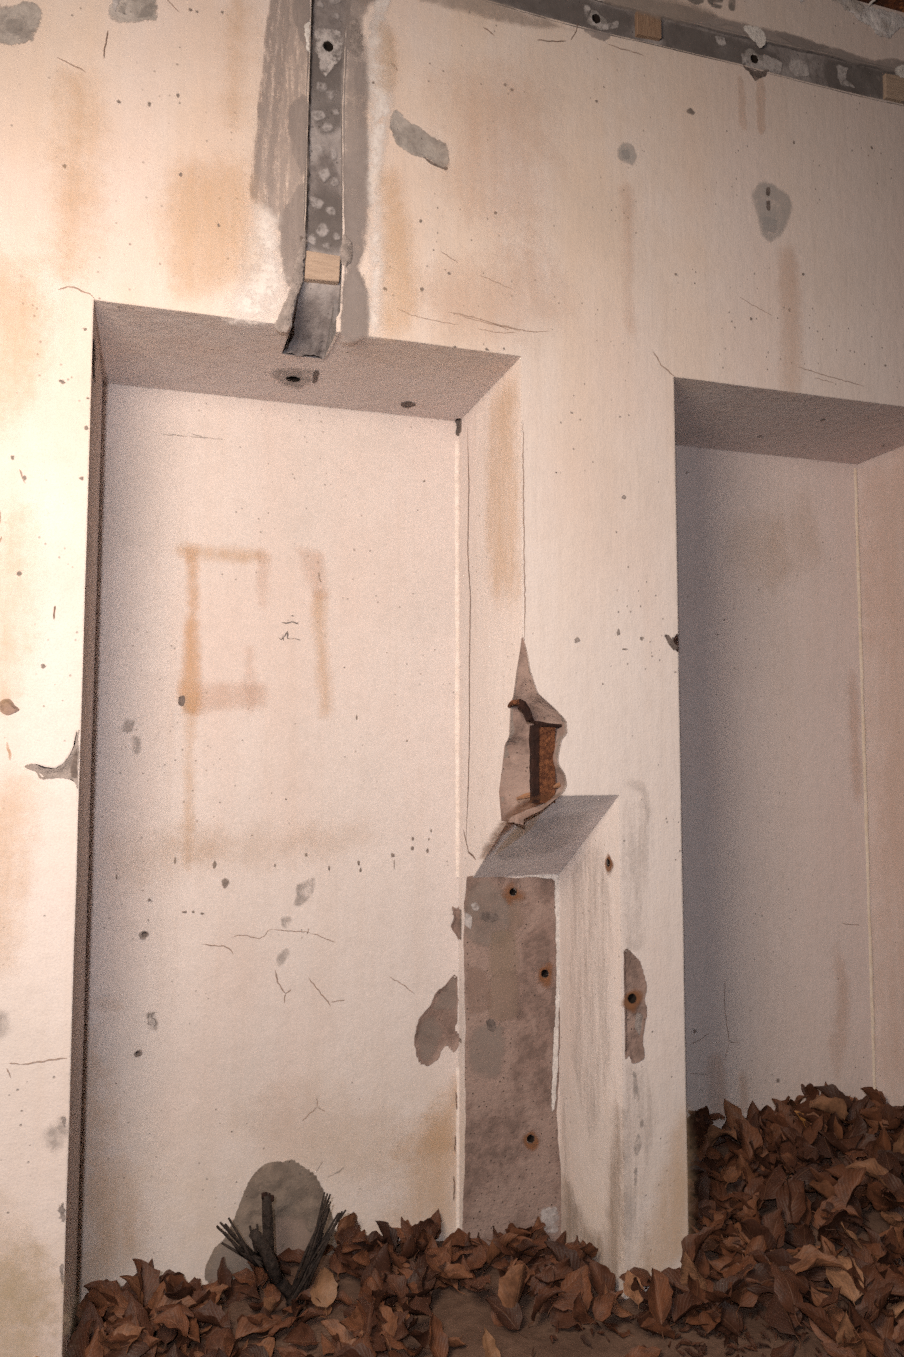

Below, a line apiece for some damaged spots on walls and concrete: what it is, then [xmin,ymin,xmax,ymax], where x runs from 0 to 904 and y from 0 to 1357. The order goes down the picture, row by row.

spalling [0,1,42,46]
spalling [108,0,157,23]
peeling [834,0,904,38]
spalling [390,110,449,171]
spalling [754,184,790,239]
spalling [499,637,567,825]
crack [205,929,334,953]
crack [275,971,344,1007]
spalling [624,949,647,1063]
peeling [414,876,561,1246]